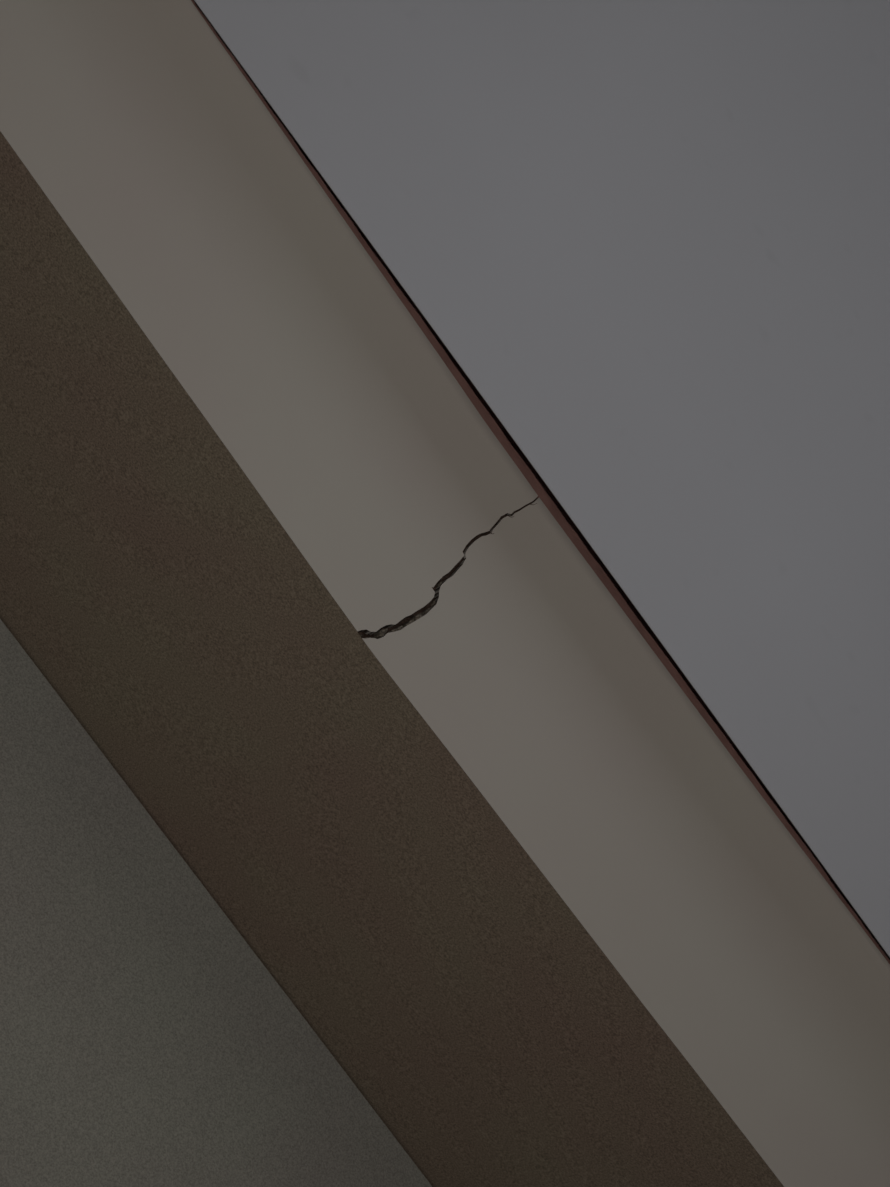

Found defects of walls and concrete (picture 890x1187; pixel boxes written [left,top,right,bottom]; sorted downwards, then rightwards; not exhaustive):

crack [358,498,537,639]